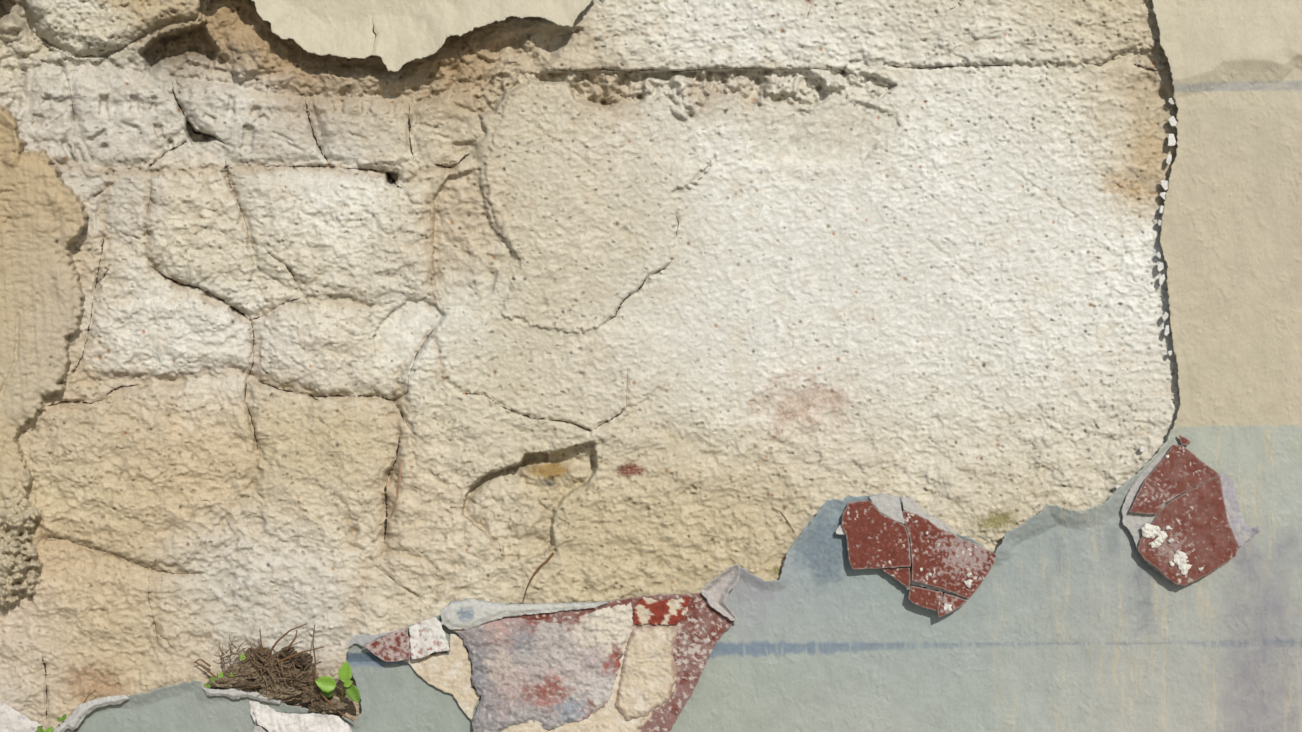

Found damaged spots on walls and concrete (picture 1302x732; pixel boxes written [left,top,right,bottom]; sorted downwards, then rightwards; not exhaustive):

crack [265,101,470,189]
crack [545,59,855,72]
spalling [746,101,901,167]
crack [892,63,1010,71]
peeling [29,380,259,566]
peeling [83,242,254,380]
crack [48,82,434,600]
peeling [249,382,403,553]
peeling [226,167,434,336]
crack [465,371,628,432]
crack [607,161,711,321]
peeling [403,564,740,732]